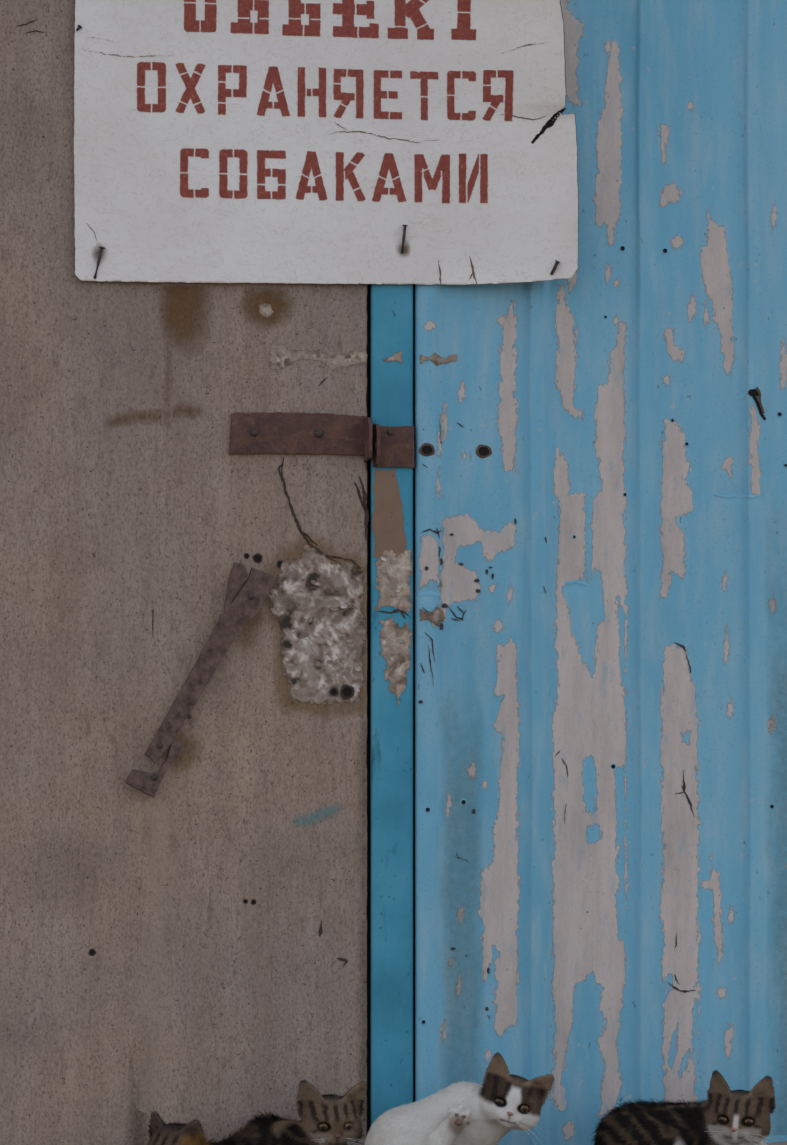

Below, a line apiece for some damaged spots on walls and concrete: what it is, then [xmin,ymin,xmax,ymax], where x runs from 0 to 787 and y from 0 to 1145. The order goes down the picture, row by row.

peeling [561,0,584,106]
peeling [593,40,625,246]
peeling [269,343,367,370]
peeling [383,351,402,363]
peeling [419,353,457,366]
peeling [687,207,735,375]
crack [278,457,369,570]
spalling [268,469,517,705]
peeling [659,418,693,598]
peeling [550,272,629,1140]
peeling [456,620,521,1036]
peeling [659,642,735,1104]